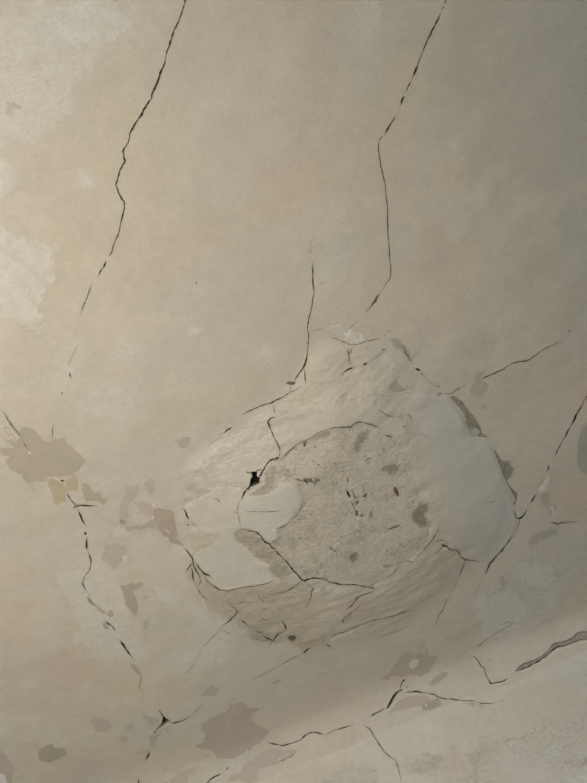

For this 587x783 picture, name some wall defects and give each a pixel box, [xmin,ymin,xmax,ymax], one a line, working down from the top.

crack [80,0,186,314]
crack [348,0,446,328]
crack [66,493,142,689]
peeling [118,478,185,547]
spalling [182,412,437,668]
crack [183,238,537,685]
spalling [311,324,419,363]
spalling [437,392,489,438]
spalling [494,450,518,505]
crack [547,395,587,472]
peeling [194,702,297,783]
crack [248,620,517,782]